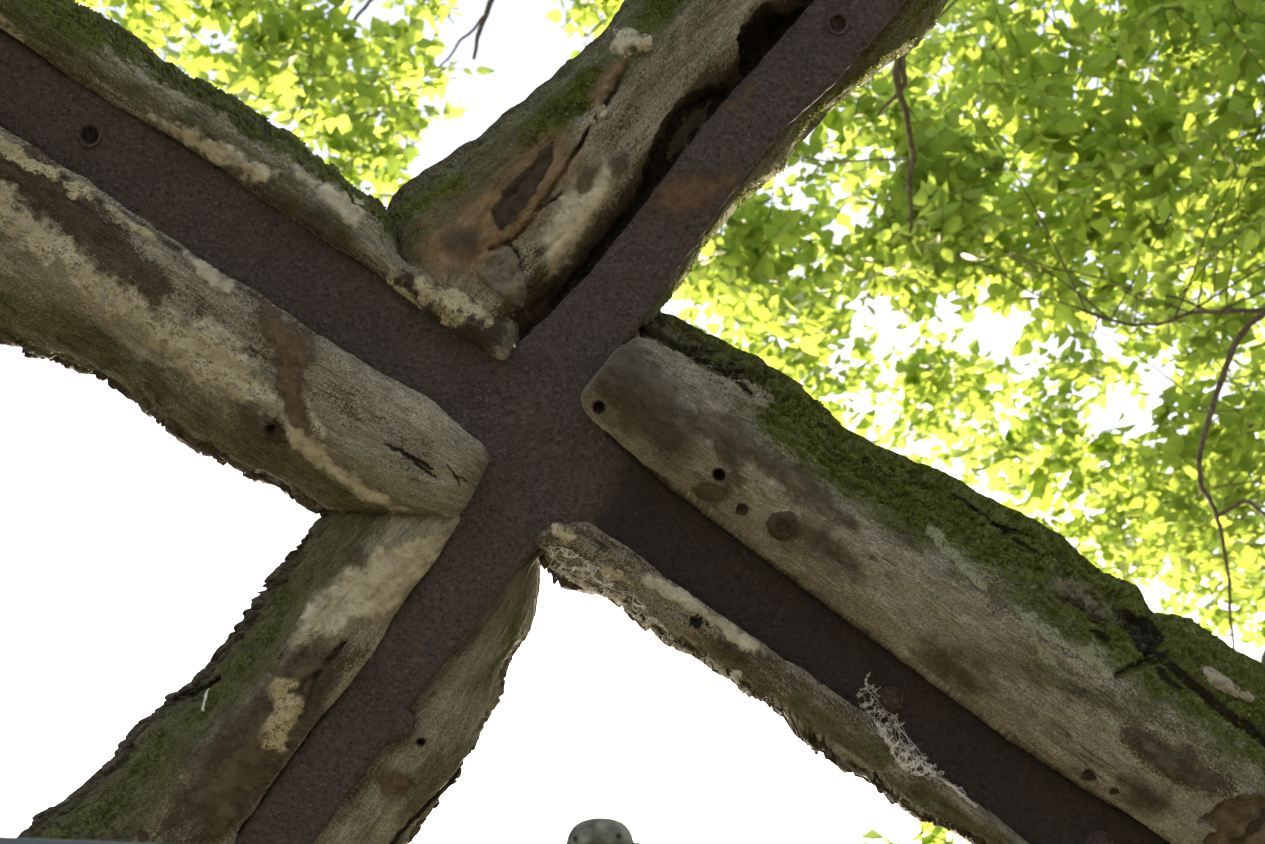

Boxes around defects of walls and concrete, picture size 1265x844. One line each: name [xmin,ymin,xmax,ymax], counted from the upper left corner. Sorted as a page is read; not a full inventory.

crack [497,65,627,271]
crack [385,444,468,486]
rust [765,511,801,541]
crack [1062,596,1265,744]